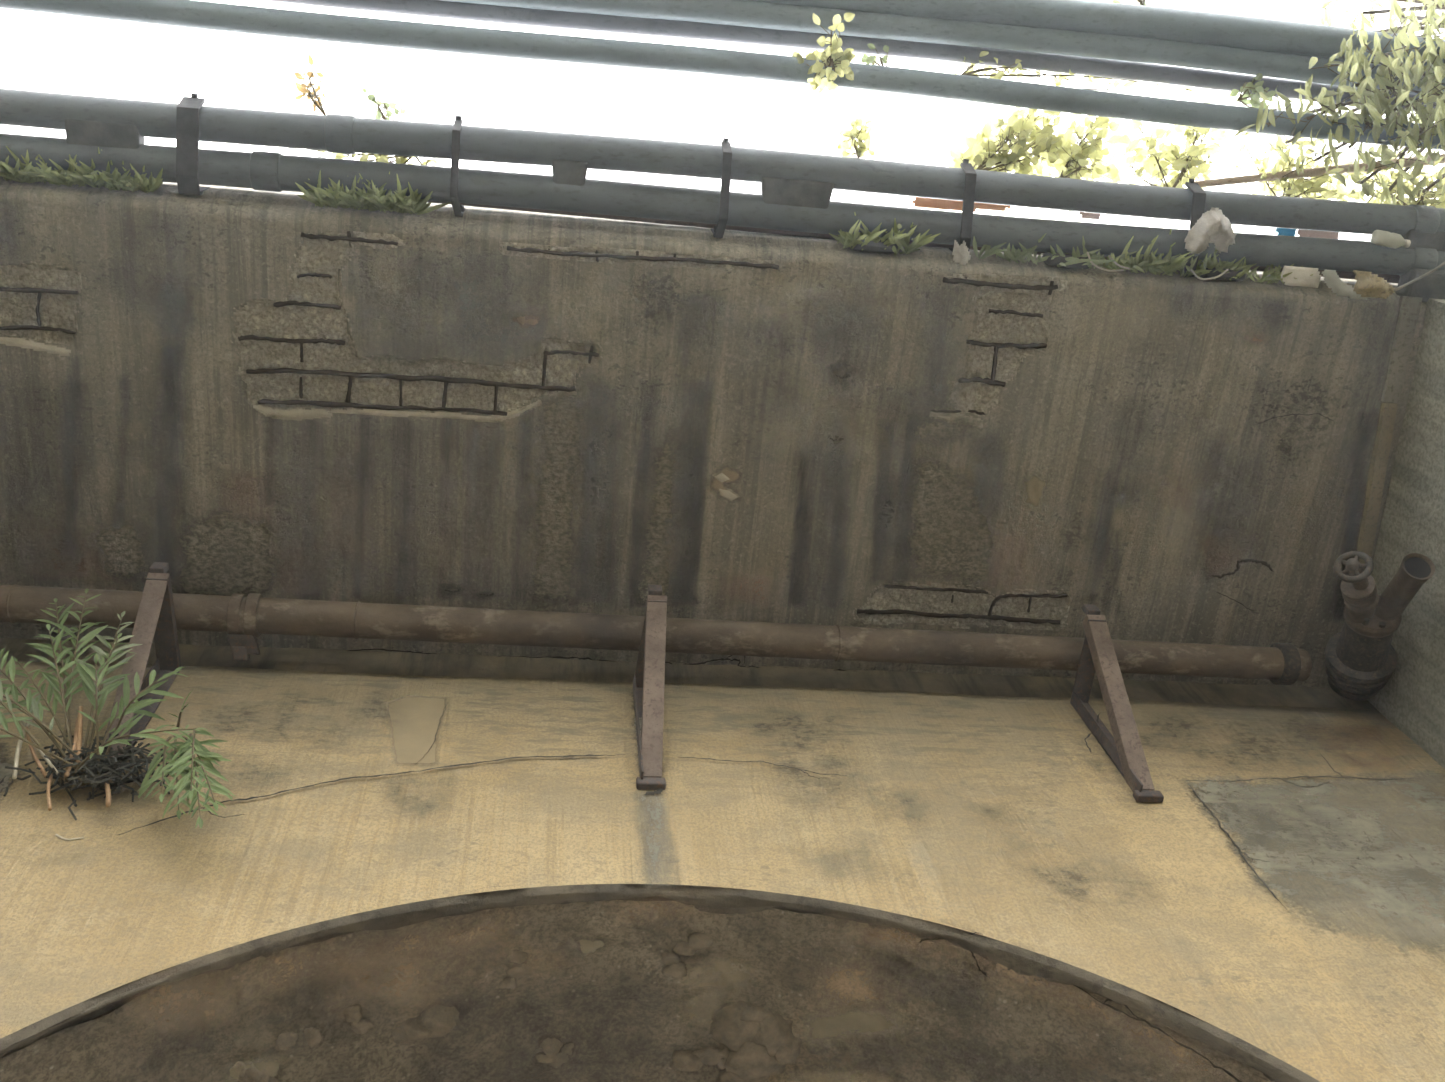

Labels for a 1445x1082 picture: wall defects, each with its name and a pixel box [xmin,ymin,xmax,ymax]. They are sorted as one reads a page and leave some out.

spalling [0,261,82,356]
spalling [230,231,603,423]
spalling [929,273,1069,428]
spalling [852,579,1074,630]
crack [119,703,625,835]